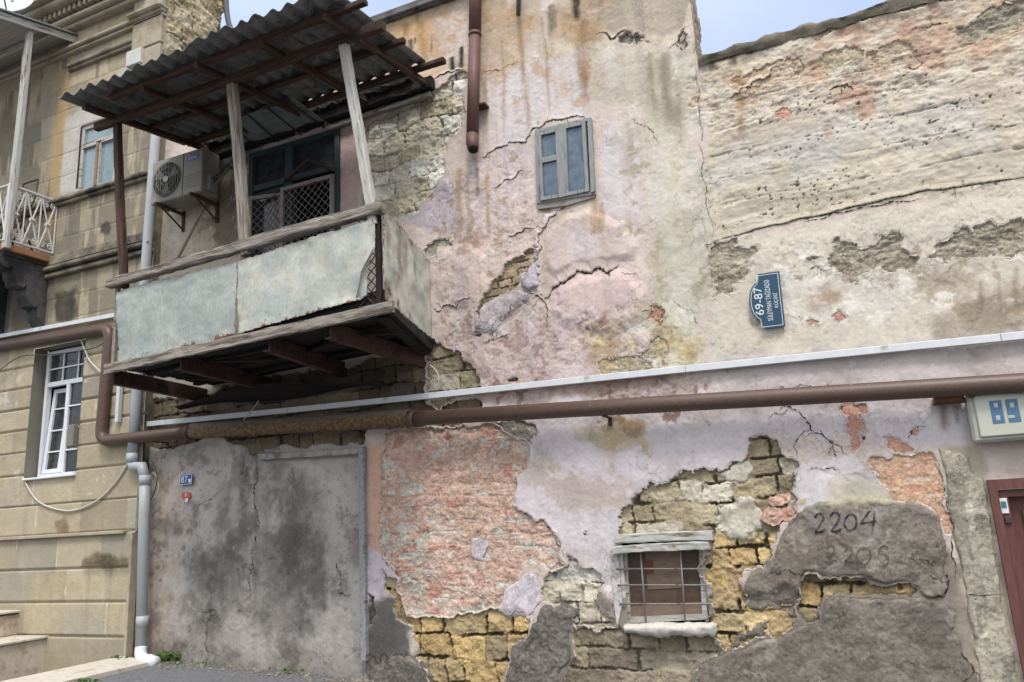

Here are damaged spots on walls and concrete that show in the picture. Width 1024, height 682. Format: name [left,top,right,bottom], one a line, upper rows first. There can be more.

damp [450,46,463,70]
flaking render [357,70,468,225]
crack [480,112,597,189]
crack [596,26,1024,240]
flaking render [475,247,539,317]
crack [476,207,620,343]
flaking render [705,236,759,297]
flaking render [805,216,1024,285]
flaking render [150,341,484,451]
crack [768,382,844,471]
peeling [838,402,953,536]
peeling [220,420,919,682]